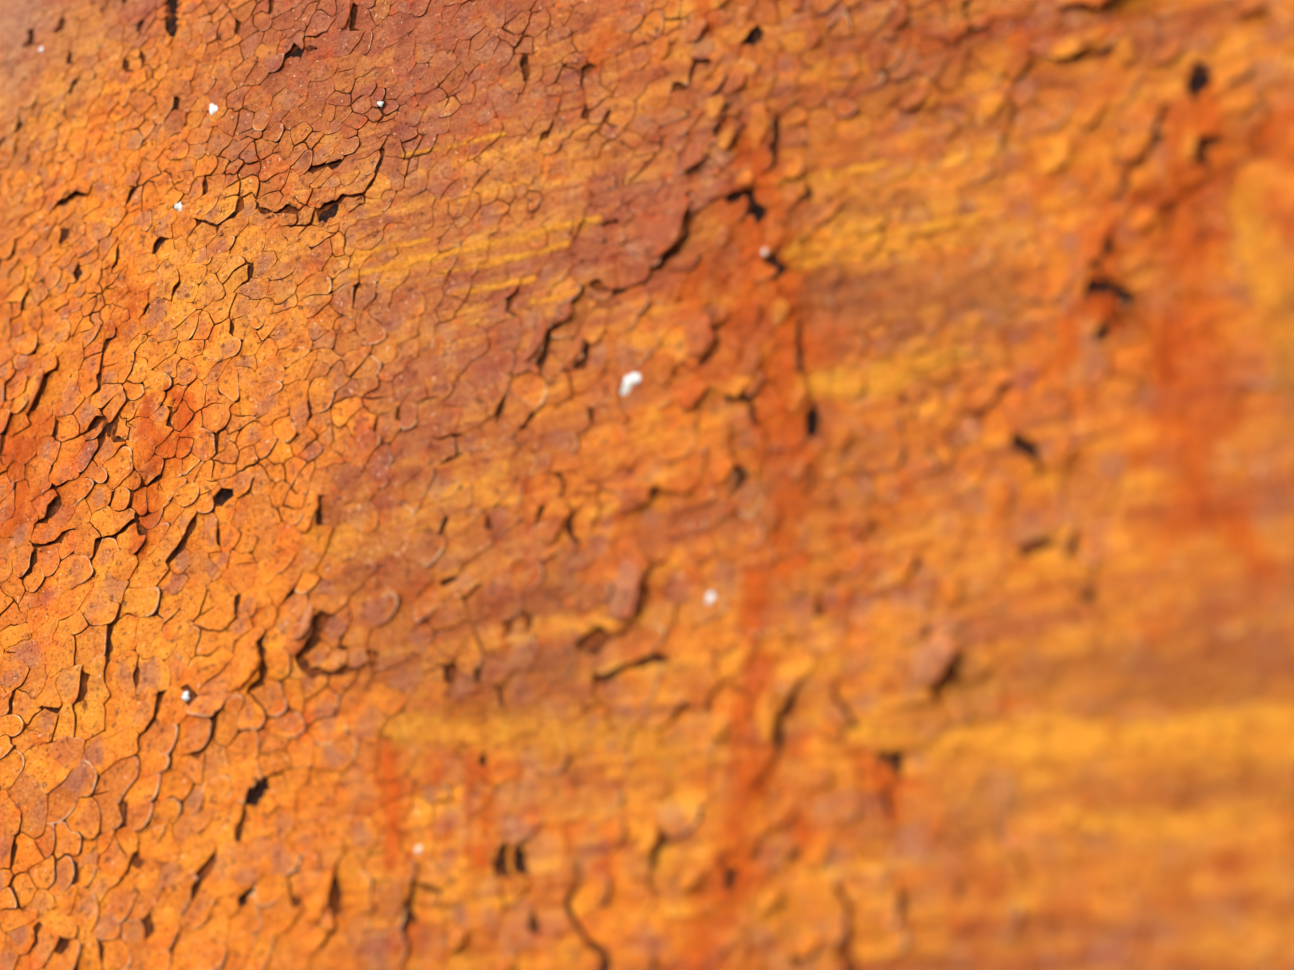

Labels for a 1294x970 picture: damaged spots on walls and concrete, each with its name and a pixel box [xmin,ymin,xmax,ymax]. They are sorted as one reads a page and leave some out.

crack [67,0,1294,317]
peeling [638,104,842,270]
peeling [74,320,126,472]
corrosion [133,386,193,554]
crack [0,45,908,970]
peeling [620,305,763,495]
crack [320,151,1294,970]
peeling [36,624,113,714]
peeling [129,656,171,734]
peeling [172,627,271,758]
peeling [632,661,795,762]
peeling [238,865,342,952]